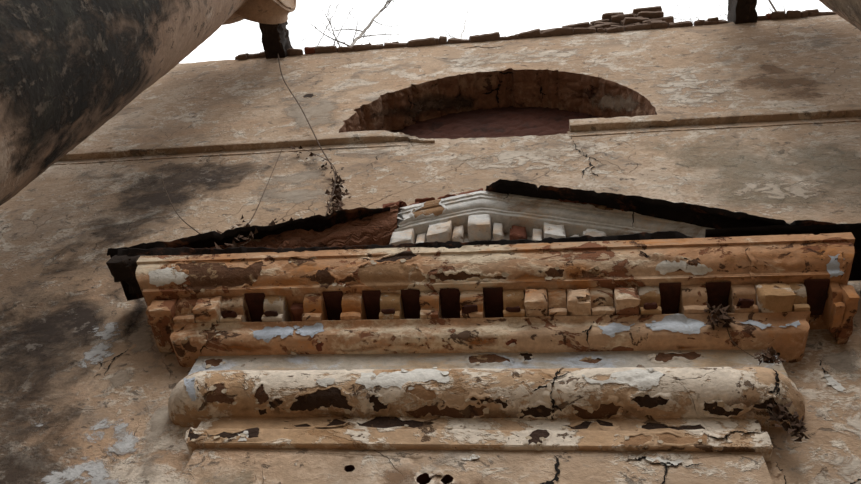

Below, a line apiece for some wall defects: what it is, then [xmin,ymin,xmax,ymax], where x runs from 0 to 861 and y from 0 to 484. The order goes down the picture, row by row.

crack [568,136,601,182]
peeling [383,188,492,220]
peeling [731,181,817,203]
peeling [148,259,267,295]
peeling [287,251,509,293]
peeling [541,266,567,281]
crack [93,344,136,378]
peeling [251,323,326,355]
peeling [465,337,534,367]
peeling [598,313,706,338]
peeling [184,350,782,466]
crack [540,455,560,484]